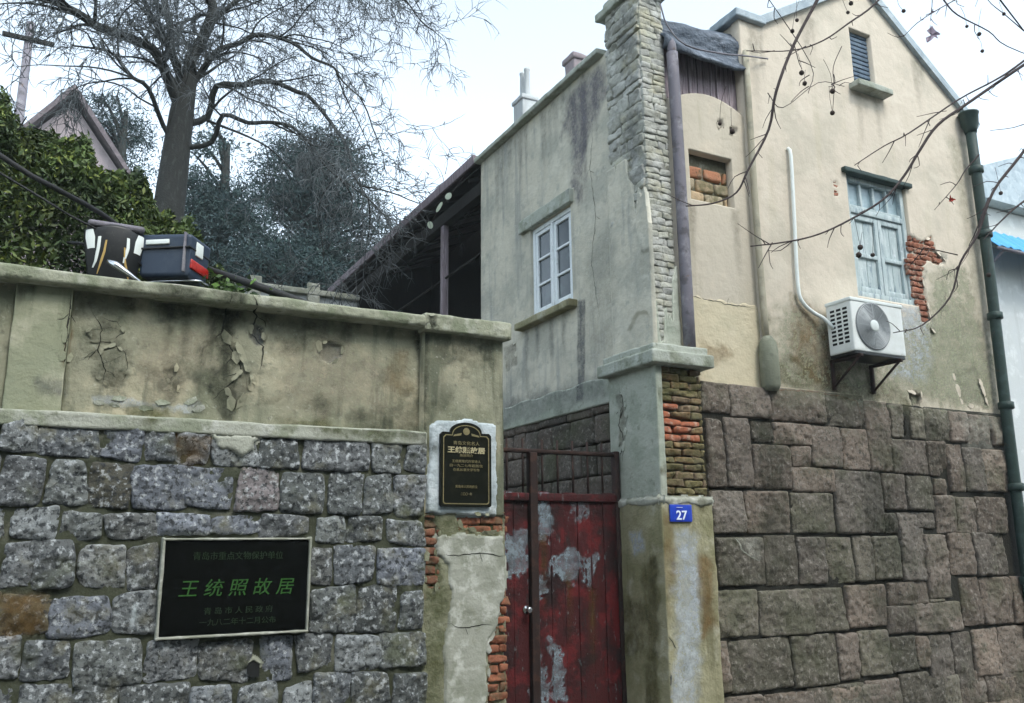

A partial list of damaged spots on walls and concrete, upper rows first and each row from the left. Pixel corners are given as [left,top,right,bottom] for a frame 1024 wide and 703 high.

leakage [563,72,606,199]
spalling [904,235,947,342]
crack [62,295,115,383]
peeling [221,329,257,411]
crack [215,297,266,414]
spalling [663,403,700,443]
spalling [420,513,441,595]
spalling [457,512,528,702]
peeling [538,492,552,542]
peeling [541,638,568,703]
peeling [550,548,599,589]
leakage [674,566,699,703]